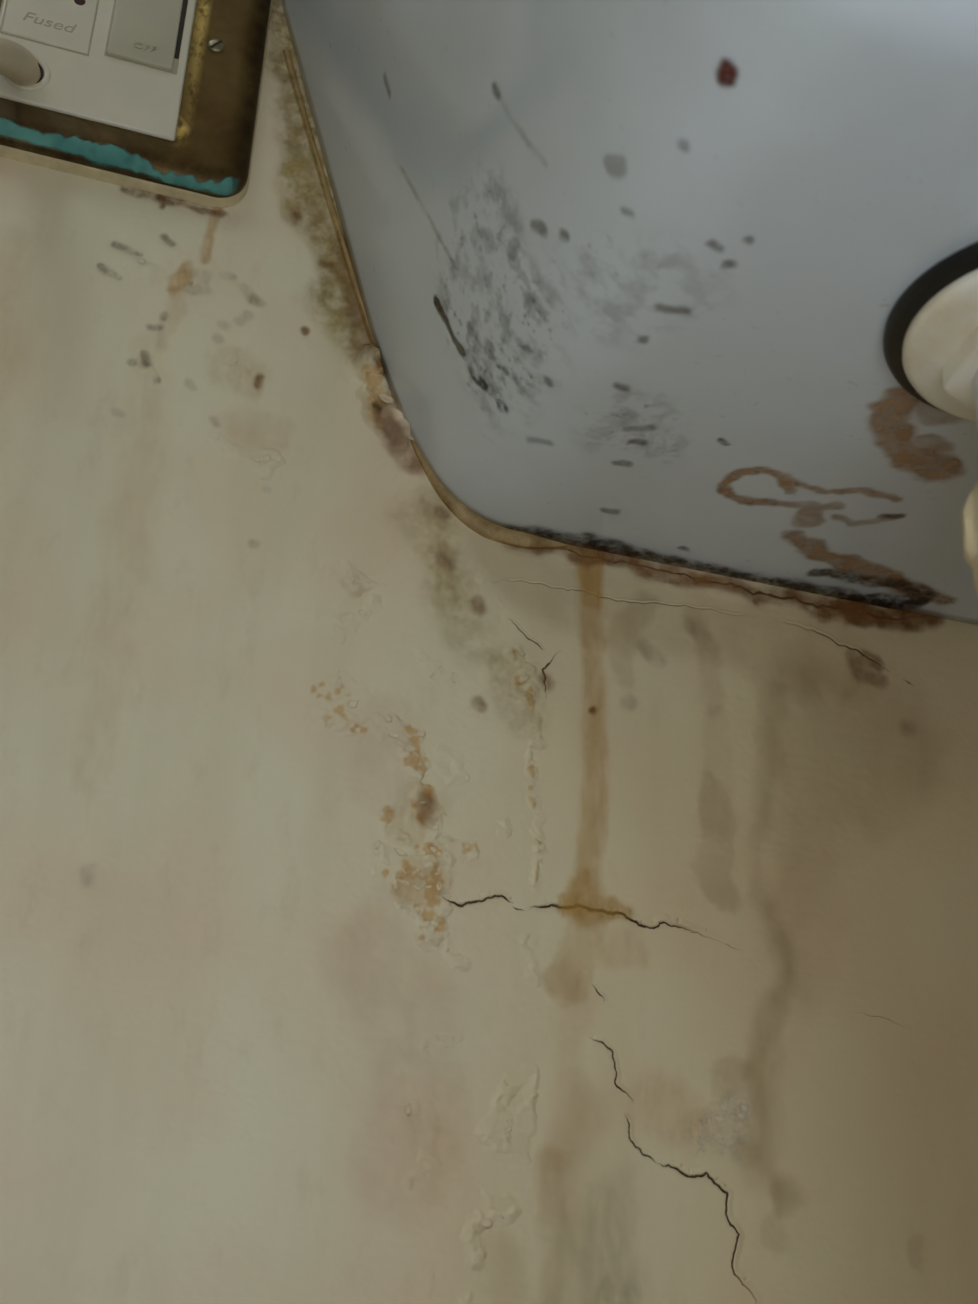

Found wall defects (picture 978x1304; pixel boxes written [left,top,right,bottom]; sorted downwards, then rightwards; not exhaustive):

damp [271,11,385,373]
damp [434,298,464,355]
damp [374,404,404,445]
rust [872,388,961,479]
rust [718,467,850,505]
rust [785,532,953,604]
peeling [370,723,482,953]
crack [443,889,727,942]
crack [590,1033,763,1304]